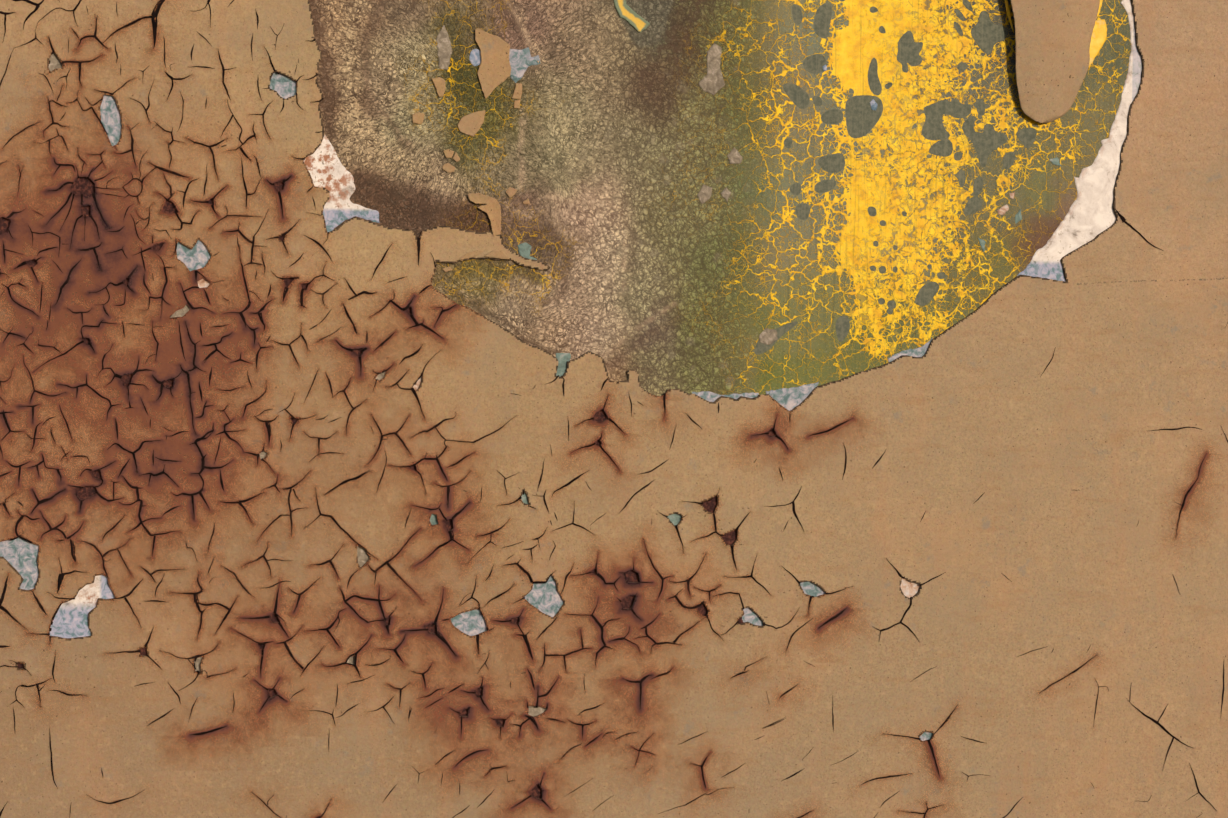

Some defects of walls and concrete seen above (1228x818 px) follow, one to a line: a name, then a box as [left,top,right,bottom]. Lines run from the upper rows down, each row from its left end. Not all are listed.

peeling [100,95,122,146]
peeling [176,239,211,288]
peeling [304,0,1142,411]
crack [1115,209,1161,250]
corrosion [0,17,737,818]
crack [0,0,886,818]
corrosion [1175,450,1210,538]
peeling [0,537,39,590]
peeling [50,575,115,638]
crack [872,558,946,641]
crack [782,698,989,818]
crack [1020,645,1216,818]